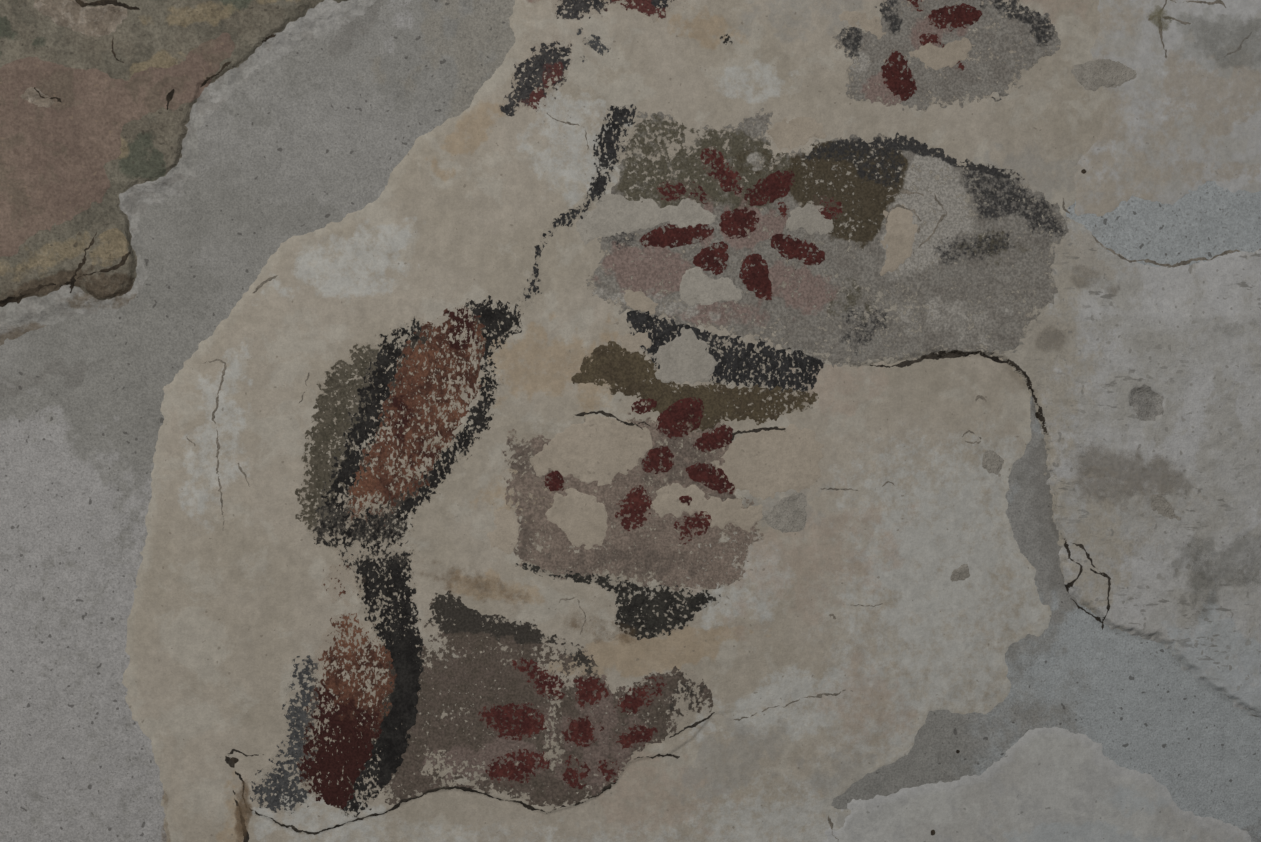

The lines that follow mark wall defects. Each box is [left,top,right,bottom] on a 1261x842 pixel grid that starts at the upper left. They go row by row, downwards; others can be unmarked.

spalling [33,0,127,37]
crack [1148,0,1226,58]
crack [870,350,1048,435]
spalling [1129,384,1164,421]
spalling [982,450,1004,475]
peeling [487,508,521,554]
spalling [950,564,970,582]
crack [1064,537,1111,630]